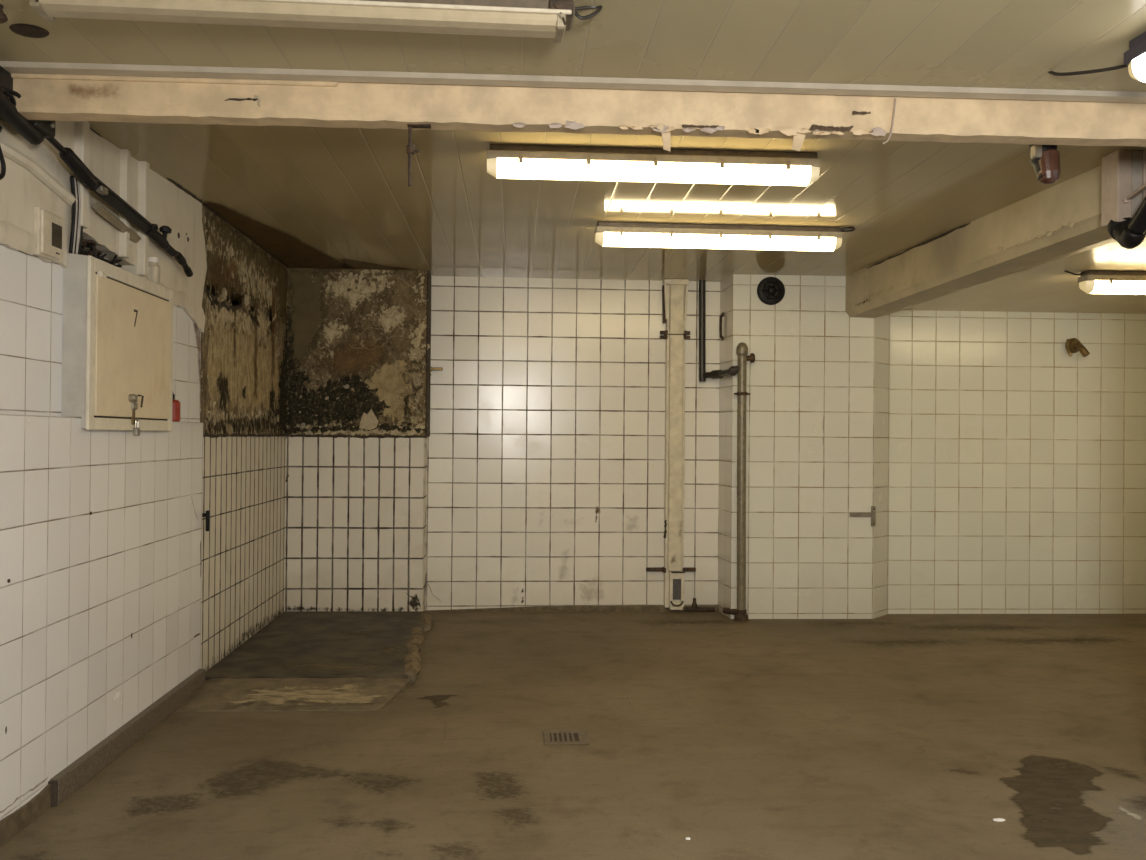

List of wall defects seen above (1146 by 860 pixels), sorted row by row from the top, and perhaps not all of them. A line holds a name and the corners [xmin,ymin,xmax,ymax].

water stain [167,178,411,270]
peeling [202,213,430,438]
water stain [207,288,427,439]
water stain [1000,756,1141,855]